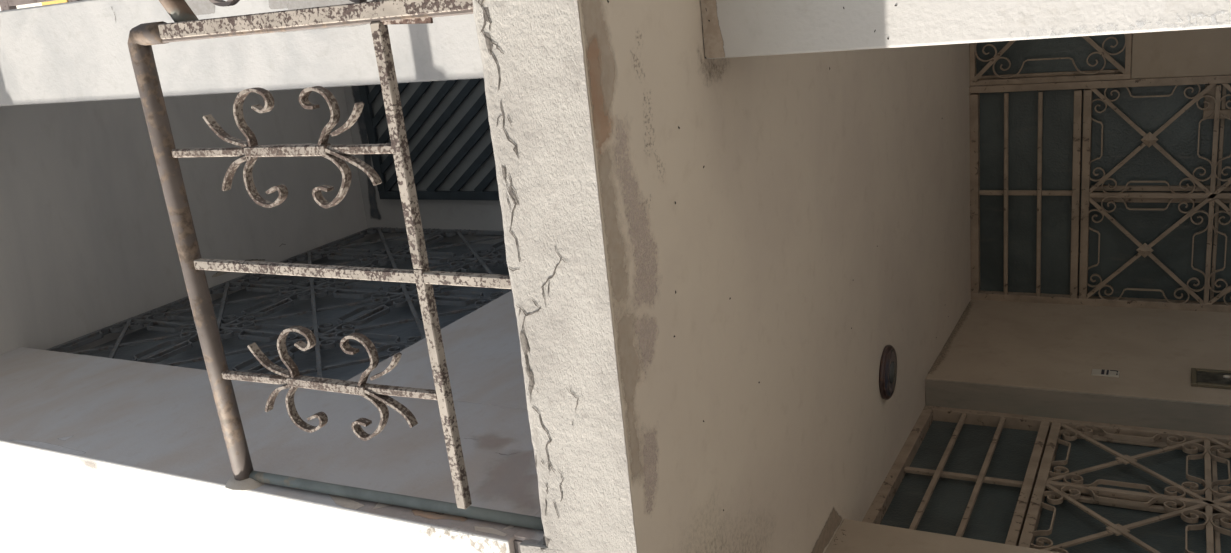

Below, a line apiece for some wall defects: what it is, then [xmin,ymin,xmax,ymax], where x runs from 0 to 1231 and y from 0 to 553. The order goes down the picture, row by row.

leakage [582,0,615,118]
crack [475,0,578,519]
leakage [599,151,627,301]
leakage [618,315,641,476]